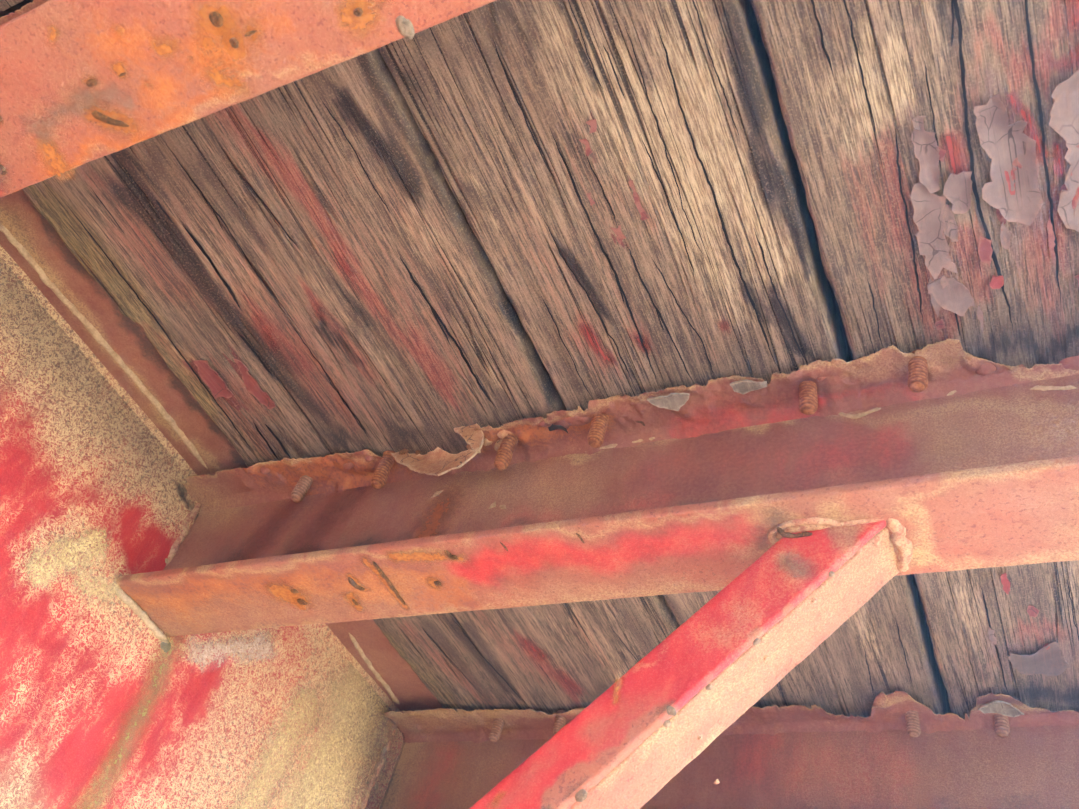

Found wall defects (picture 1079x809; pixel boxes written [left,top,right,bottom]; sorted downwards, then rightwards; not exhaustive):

rust [197,1,261,61]
rust [82,105,138,134]
crack [320,98,394,218]
crack [492,38,717,399]
crack [568,0,807,367]
crack [923,58,941,171]
crack [951,0,1014,333]
peeling [911,69,1079,334]
crack [397,251,498,411]
rust [415,493,454,538]
rust [345,574,370,612]
rust [362,558,409,610]